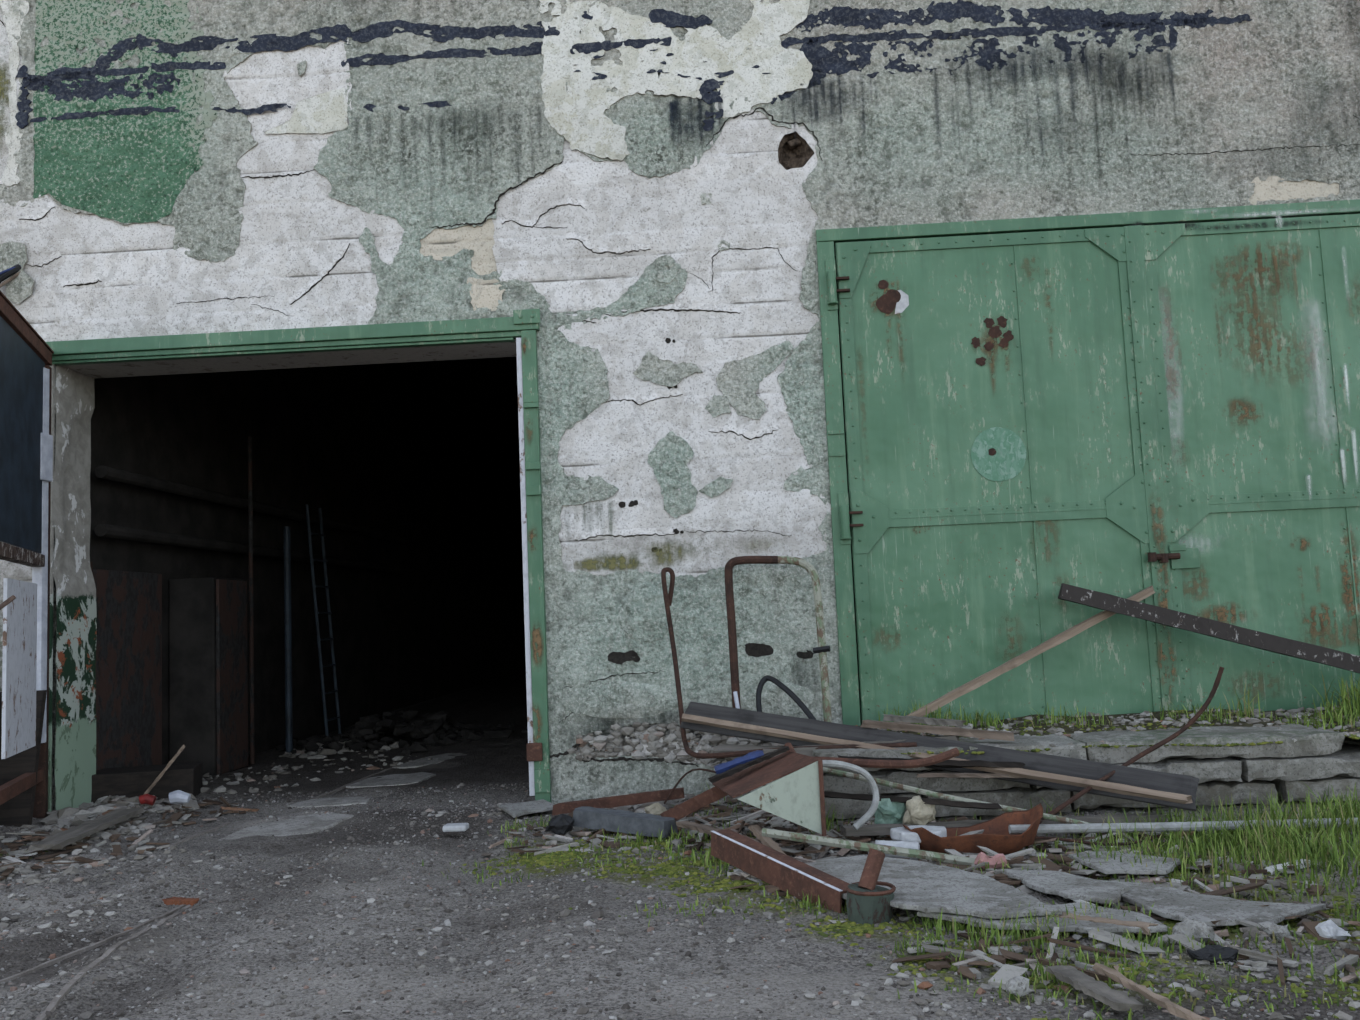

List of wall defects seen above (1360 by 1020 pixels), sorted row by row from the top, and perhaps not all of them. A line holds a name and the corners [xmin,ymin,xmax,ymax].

leakage [669,96,721,138]
leakage [798,77,842,118]
leakage [1006,50,1152,117]
peeling [0,7,404,342]
crack [176,242,350,316]
peeling [420,109,831,578]
rust [971,316,1014,384]
rust [1237,307,1282,364]
rust [1304,536,1360,644]
peeling [0,559,32,692]
spalling [608,650,640,664]
spalling [745,643,774,657]